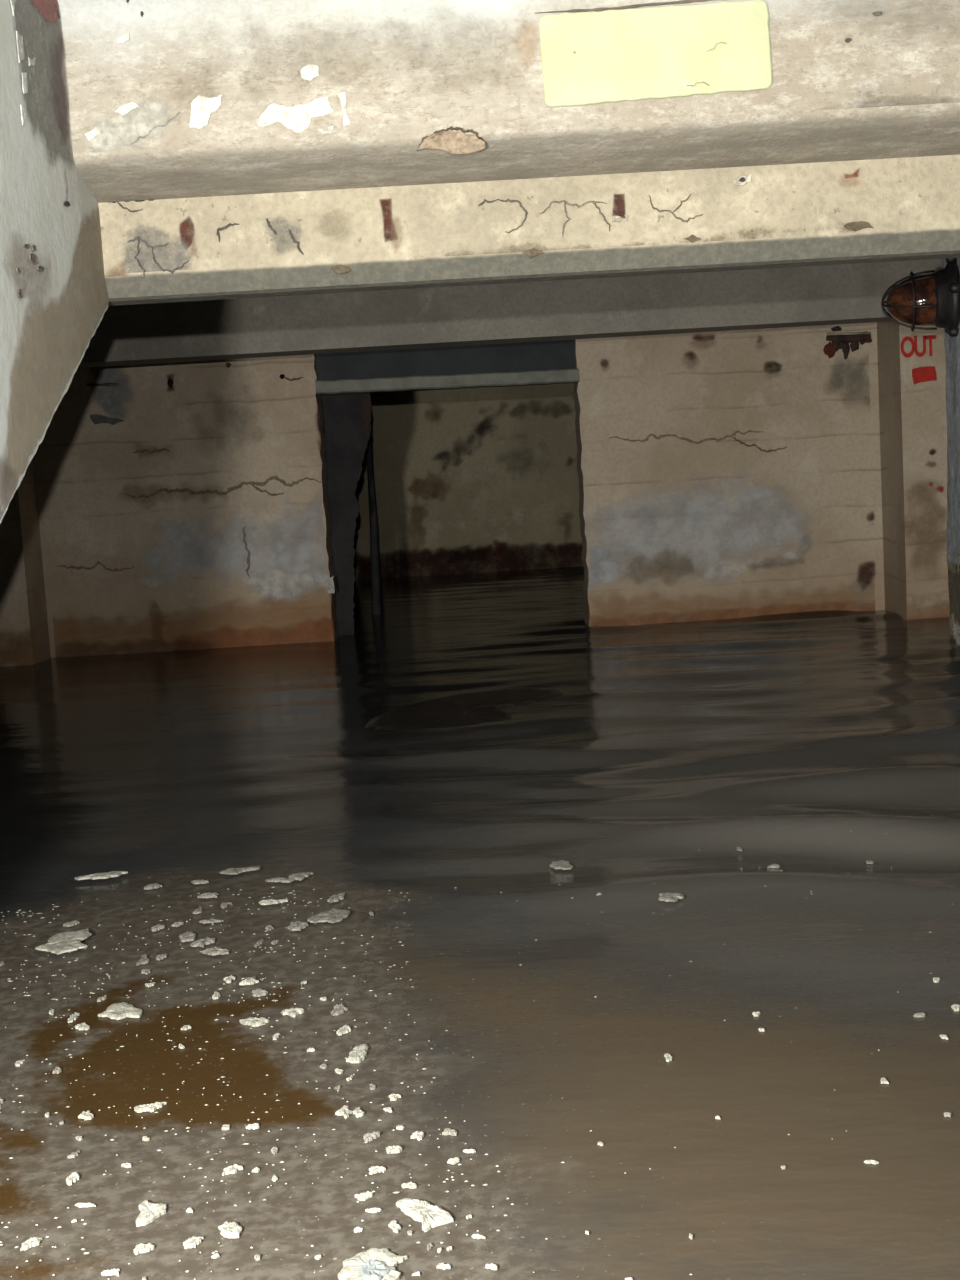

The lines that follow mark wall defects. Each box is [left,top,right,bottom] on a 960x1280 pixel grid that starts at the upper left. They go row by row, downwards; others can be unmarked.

peeling [10,0,73,164]
peeling [301,64,319,81]
peeling [85,95,223,151]
peeling [257,91,351,135]
rust [180,218,194,249]
rust [380,199,397,240]
crack [478,199,611,236]
crack [648,194,703,222]
crack [609,430,787,452]
crack [125,476,321,499]
damp [154,507,328,598]
damp [595,491,810,582]